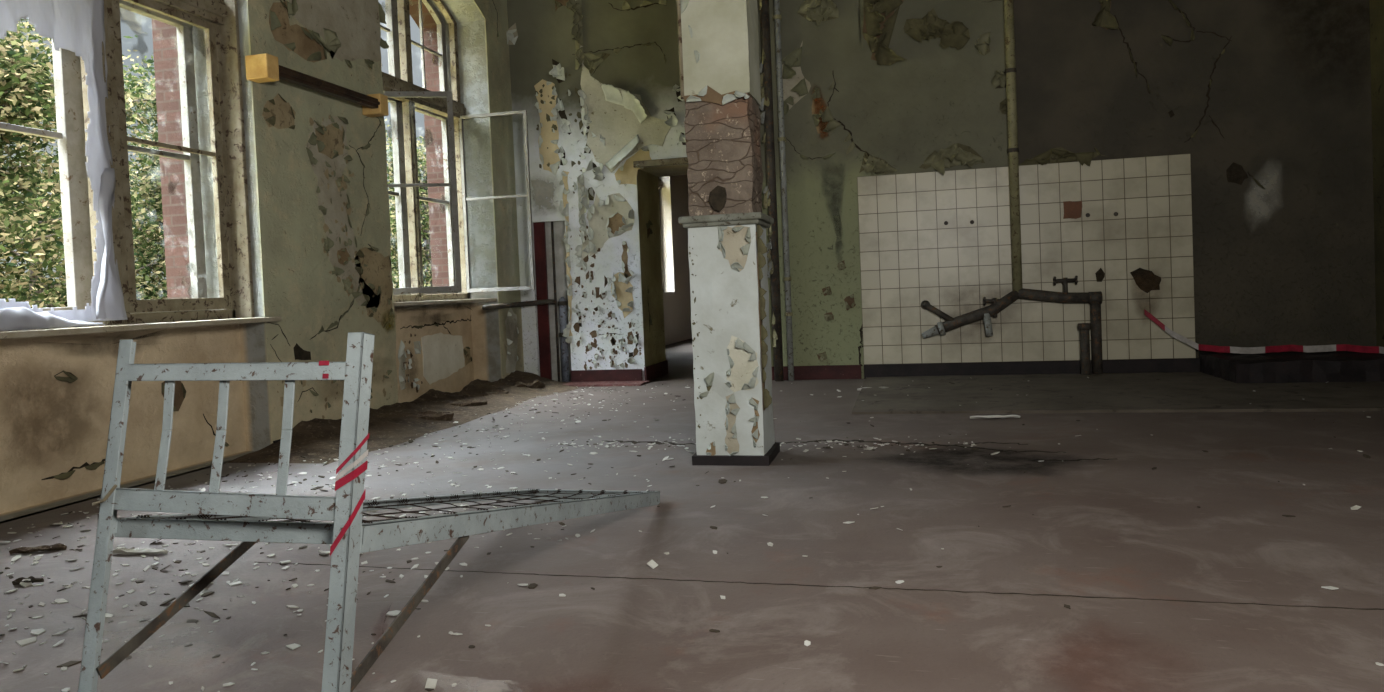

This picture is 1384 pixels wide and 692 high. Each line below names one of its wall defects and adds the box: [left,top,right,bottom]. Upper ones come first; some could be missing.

spalling [269,0,389,69]
peeling [859,0,970,65]
peeling [992,70,1007,114]
spalling [262,93,393,328]
flaking render [534,0,811,456]